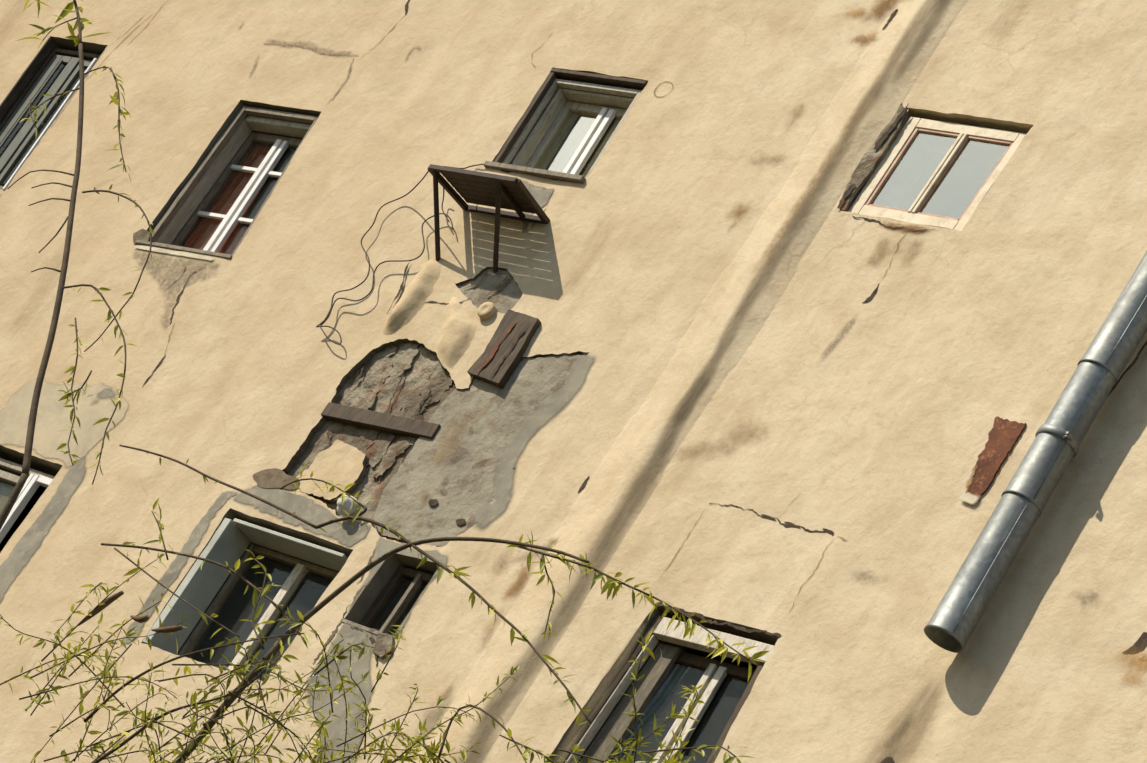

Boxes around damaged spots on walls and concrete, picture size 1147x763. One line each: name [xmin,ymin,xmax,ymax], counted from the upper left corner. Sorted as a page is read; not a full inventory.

crack [251,0,410,106]
spalling [837,103,909,212]
spalling [456,267,522,313]
crack [826,231,908,351]
peeling [252,338,595,547]
crack [655,492,847,638]